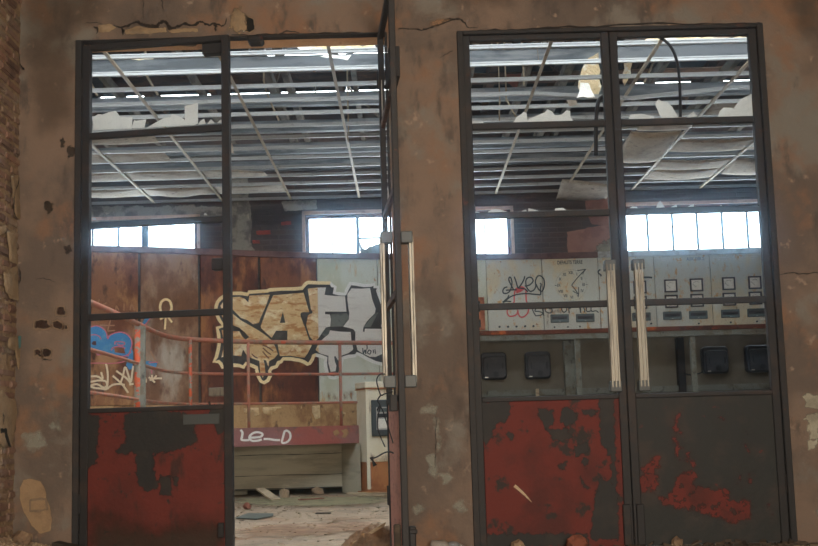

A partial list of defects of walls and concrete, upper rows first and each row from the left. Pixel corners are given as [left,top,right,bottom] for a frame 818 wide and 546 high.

crack [86,0,361,36]
crack [399,18,737,31]